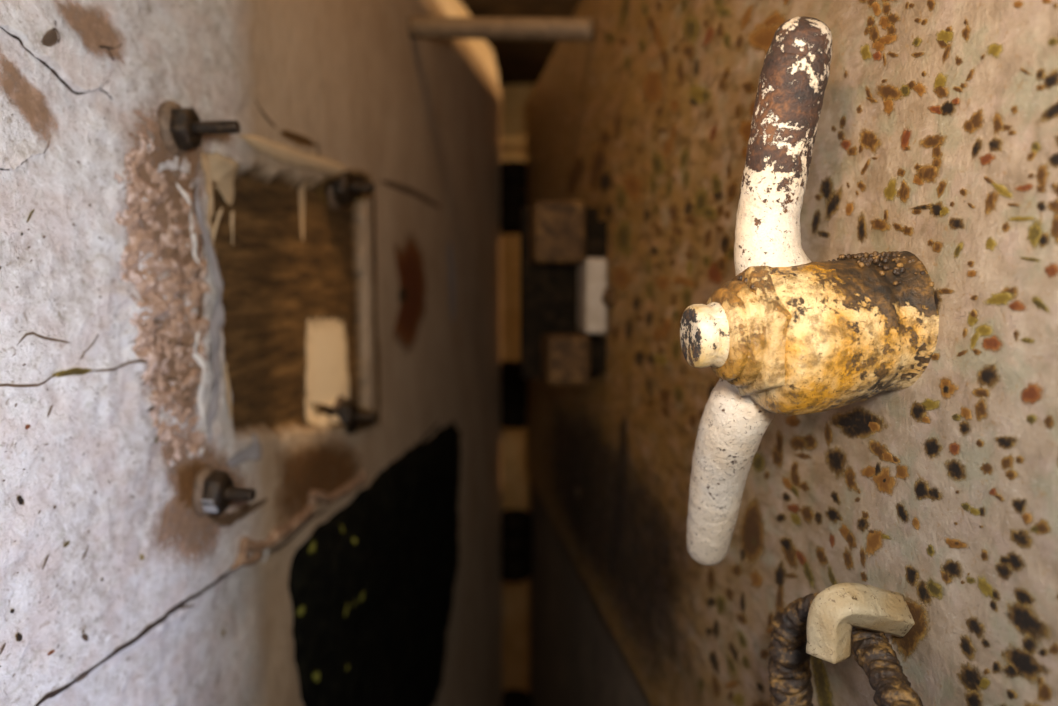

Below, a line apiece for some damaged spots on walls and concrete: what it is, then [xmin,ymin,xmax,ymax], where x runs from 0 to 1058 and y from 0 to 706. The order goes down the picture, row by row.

crack [0,27,113,100]
water stain [54,0,123,63]
rust [859,0,936,66]
water stain [0,53,58,141]
rust [831,19,985,216]
water stain [1010,216,1043,262]
flaking render [114,109,240,467]
water stain [983,292,1013,305]
water stain [1032,296,1049,312]
crack [35,569,231,706]
rust [891,598,930,661]
rust [810,655,833,706]